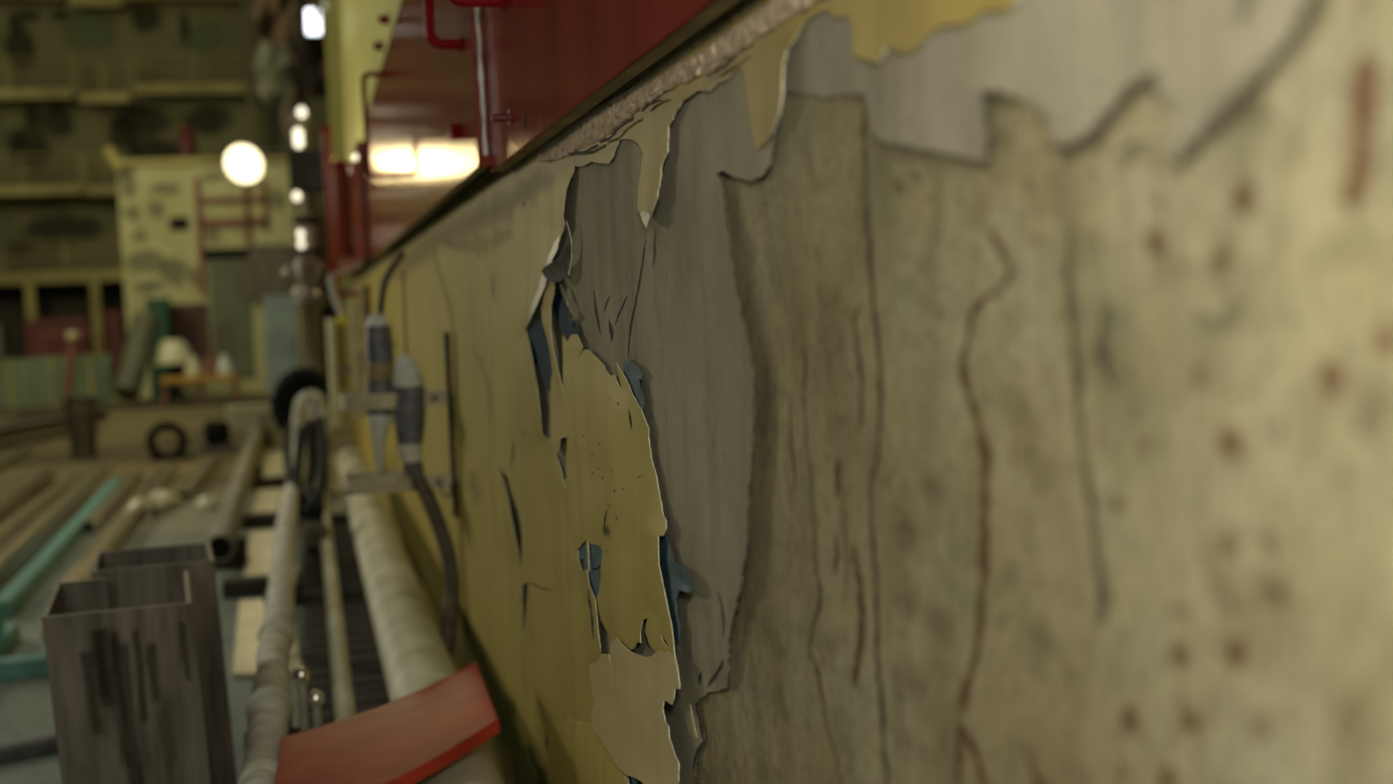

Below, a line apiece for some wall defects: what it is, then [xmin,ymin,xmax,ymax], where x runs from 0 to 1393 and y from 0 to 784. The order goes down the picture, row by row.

peeling [341,0,1307,784]